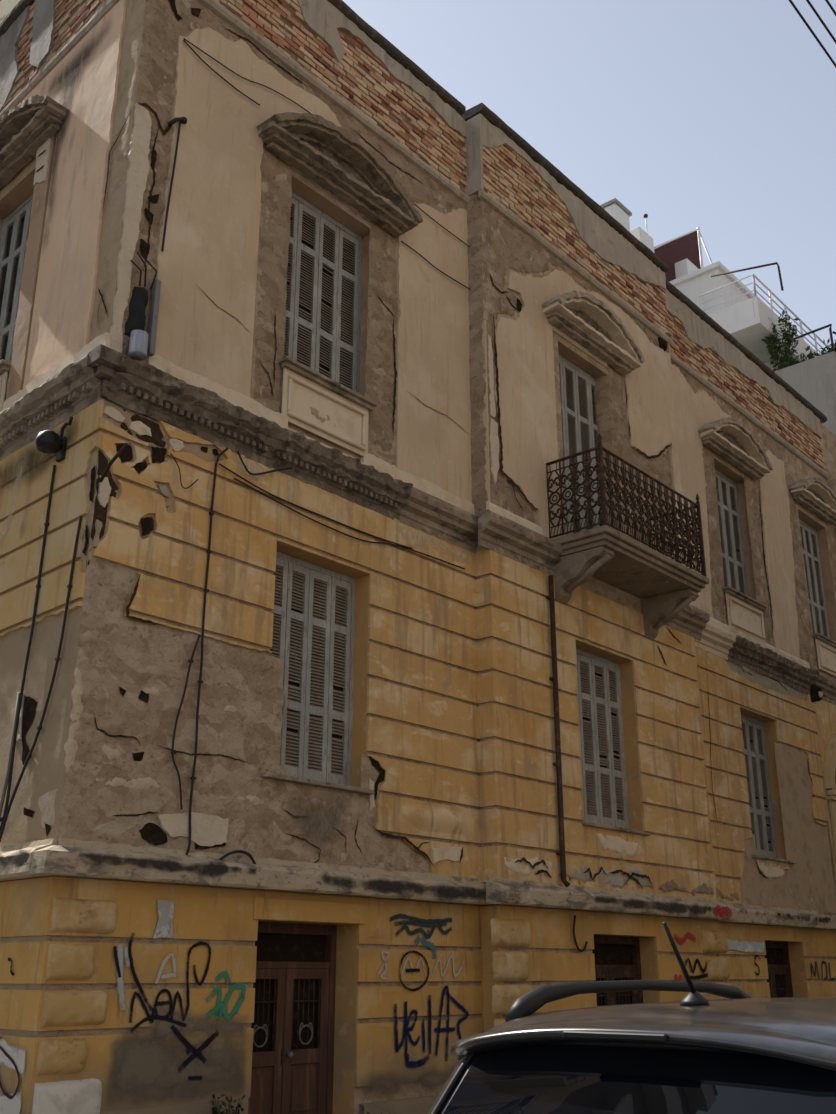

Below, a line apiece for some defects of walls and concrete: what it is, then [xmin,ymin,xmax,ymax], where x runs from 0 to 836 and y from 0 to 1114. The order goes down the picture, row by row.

flaking render [90,0,618,524]
flaking render [0,406,463,873]
flaking render [593,367,672,557]
flaking render [630,315,816,669]
peeling [504,833,739,901]